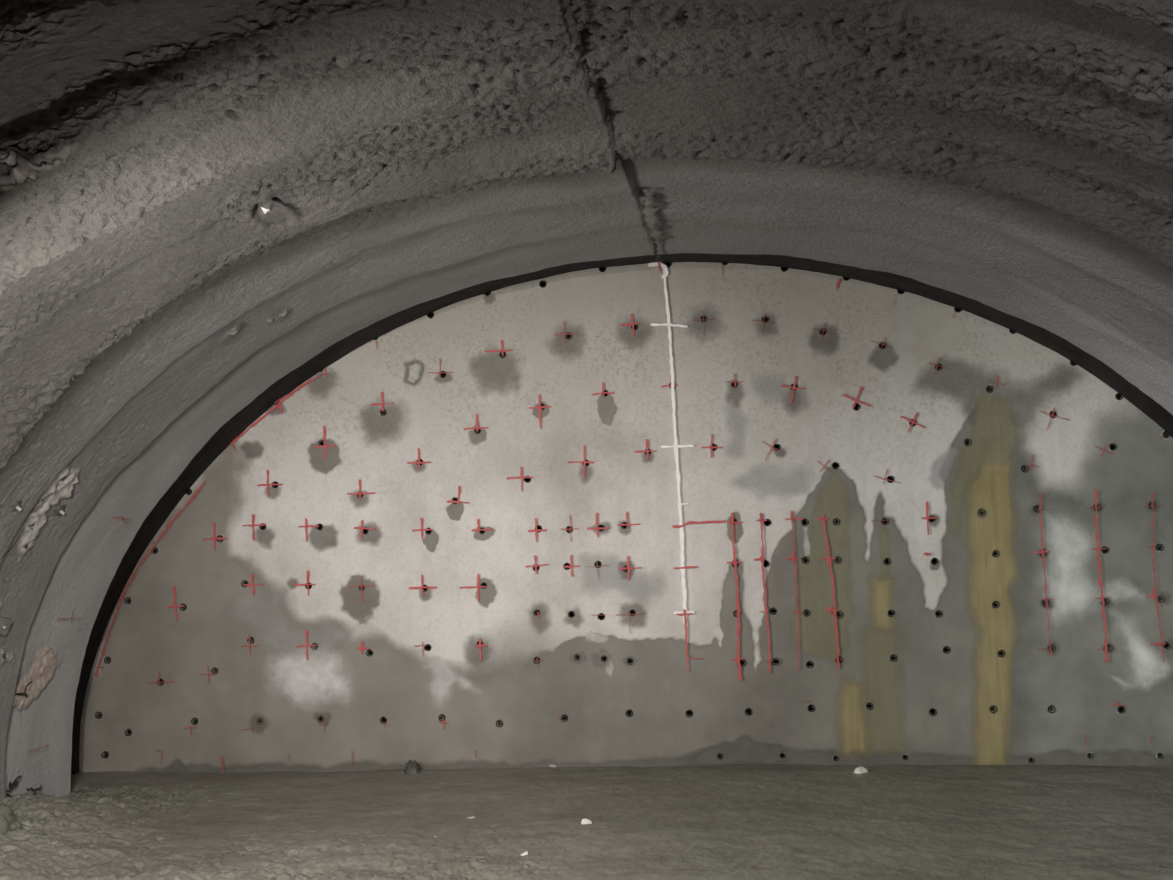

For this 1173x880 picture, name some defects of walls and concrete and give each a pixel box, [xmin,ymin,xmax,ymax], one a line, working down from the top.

spalling [0,145,75,191]
crack [652,223,660,262]
spalling [18,466,81,561]
leakage [79,361,1173,773]
spalling [12,646,61,710]